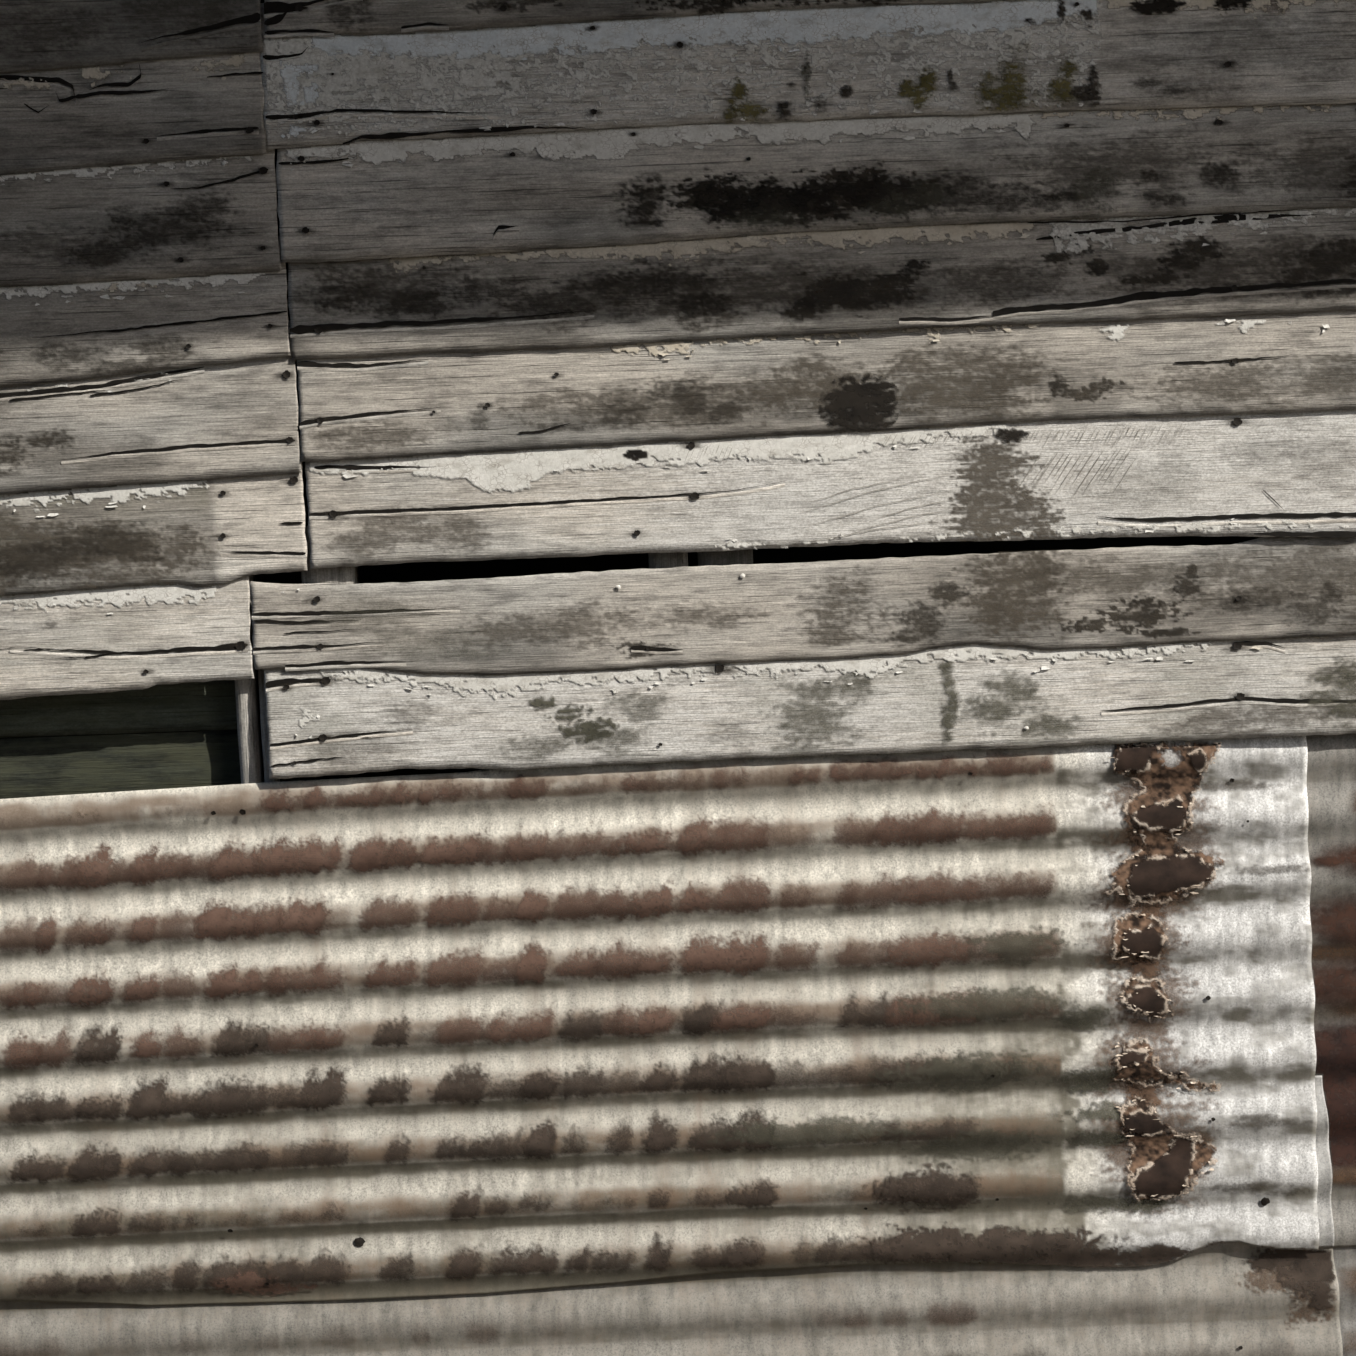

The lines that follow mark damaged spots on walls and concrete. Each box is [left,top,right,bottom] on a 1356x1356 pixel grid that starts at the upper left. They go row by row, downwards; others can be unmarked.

peeling [1,78,50,89]
peeling [264,0,1337,171]
leakage [1069,65,1101,106]
crack [157,109,583,189]
leakage [620,142,1185,229]
peeling [309,424,1006,493]
leakage [523,344,1356,646]
crack [1098,490,1356,538]
crack [0,607,460,692]
rust [0,818,769,892]
rust [1089,741,1224,1212]
rust [1310,894,1356,1185]